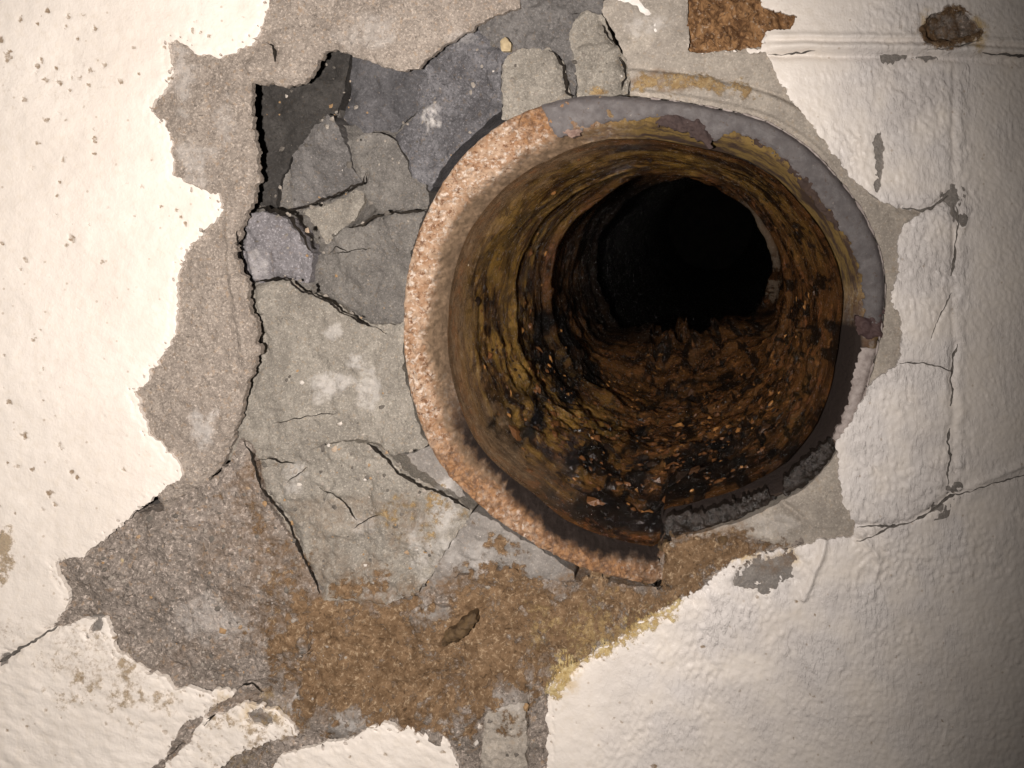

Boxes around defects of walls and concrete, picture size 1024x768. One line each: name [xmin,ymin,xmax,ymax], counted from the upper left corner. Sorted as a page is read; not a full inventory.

crack [258,172,427,255]
peeling [868,133,884,200]
crack [236,231,386,334]
peeling [854,309,885,340]
crack [903,195,959,338]
spalling [55,0,840,768]
crack [244,442,378,593]
corrosion [376,484,448,539]
crack [369,444,470,510]
crack [859,347,1024,542]
crack [0,626,57,662]
corrosion [241,502,788,741]